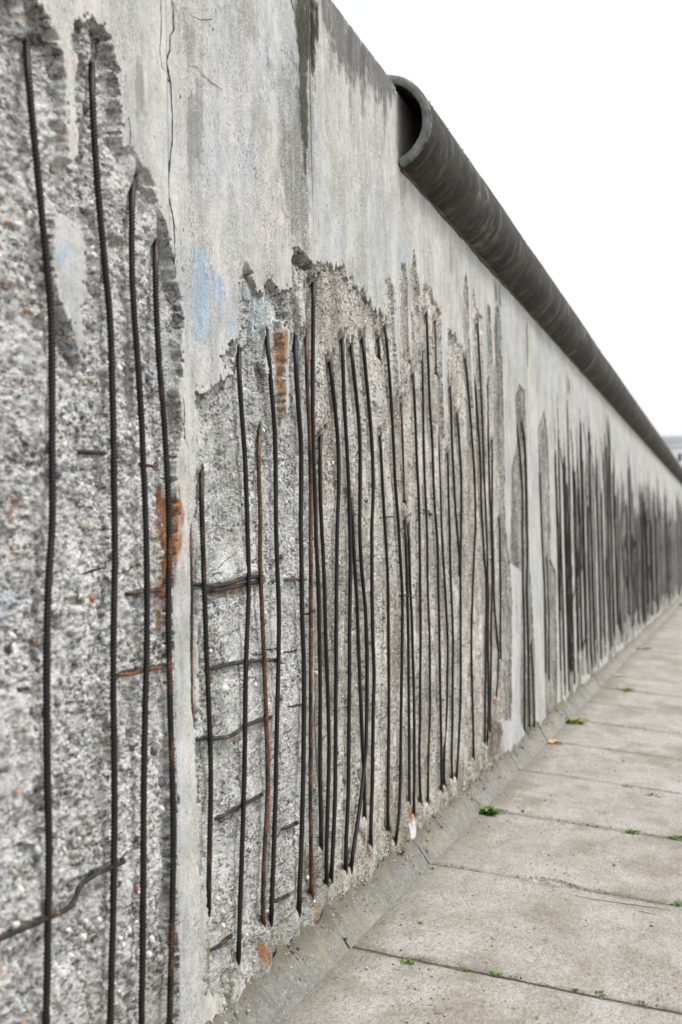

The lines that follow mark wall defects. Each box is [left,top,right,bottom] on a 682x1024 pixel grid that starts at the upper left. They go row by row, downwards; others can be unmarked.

crack [160,2,220,272]
water stain [274,0,395,268]
spalling [0,0,185,1024]
rust [155,486,184,630]
spalling [189,241,682,1012]